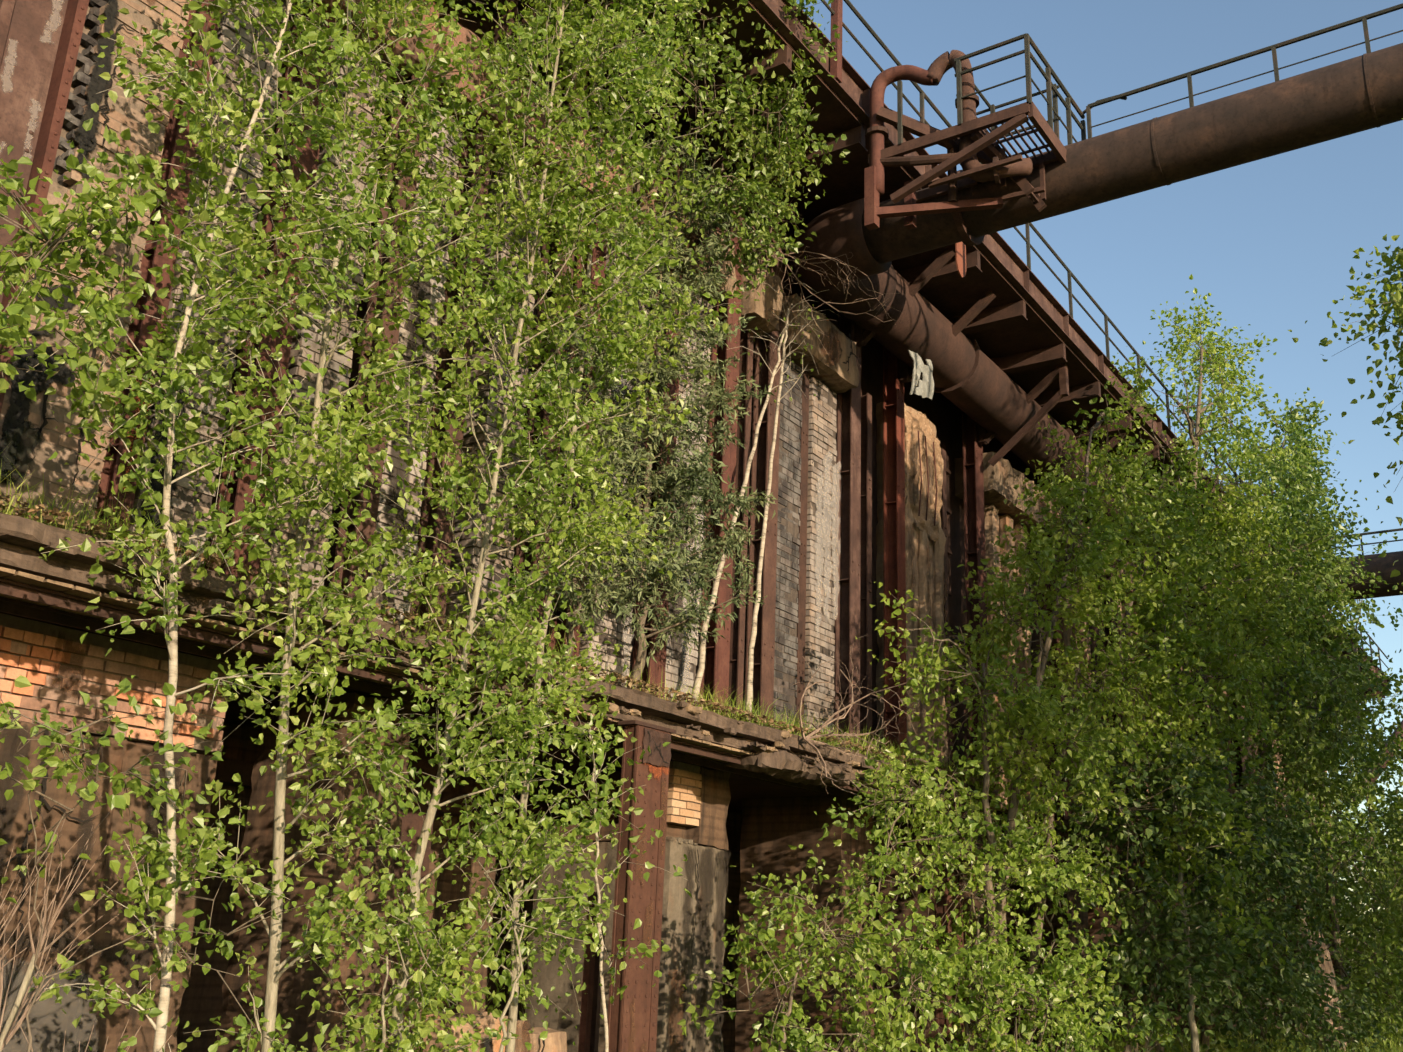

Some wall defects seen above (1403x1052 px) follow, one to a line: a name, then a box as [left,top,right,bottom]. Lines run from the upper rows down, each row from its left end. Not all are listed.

rust [645,763,669,854]
leakage [683,847,729,1052]